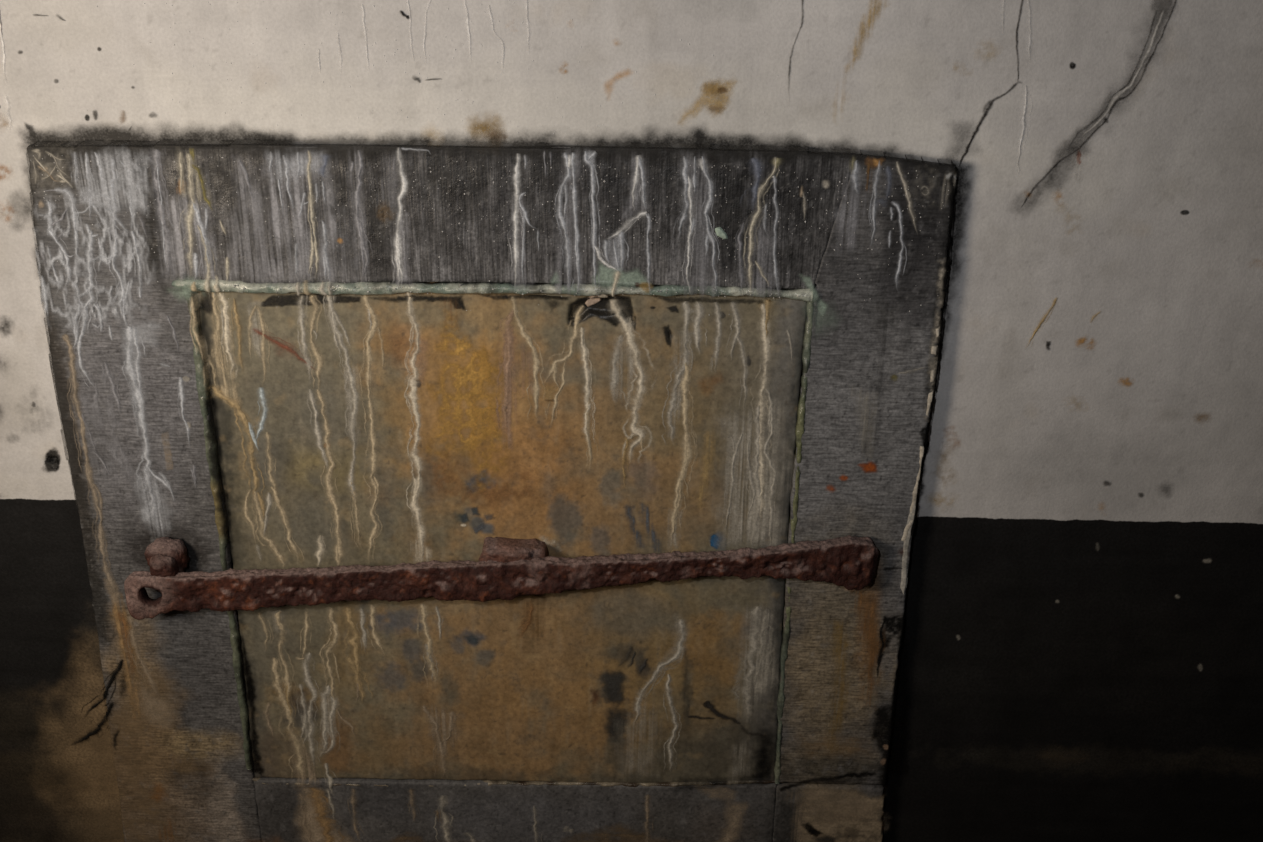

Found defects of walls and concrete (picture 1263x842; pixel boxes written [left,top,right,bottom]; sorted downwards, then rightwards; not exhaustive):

corrosion [690,83,729,113]
crack [1024,0,1176,203]
crack [911,0,1023,536]
damp [24,124,969,602]
damp [238,605,382,842]
damp [420,604,441,677]
corrosion [113,535,879,718]
damp [635,620,685,764]
damp [743,607,774,714]